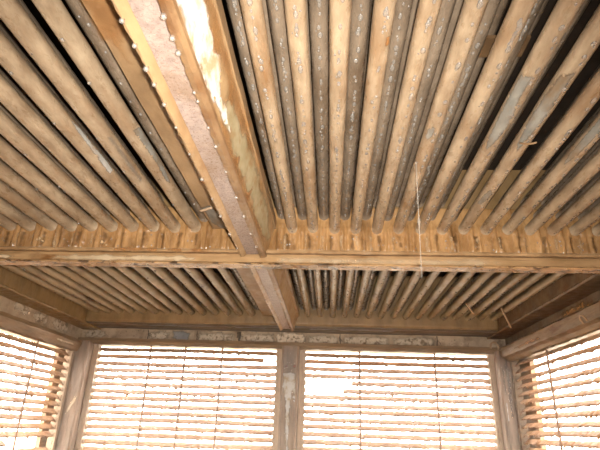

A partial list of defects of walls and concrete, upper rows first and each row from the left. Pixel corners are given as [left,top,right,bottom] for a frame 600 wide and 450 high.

peeling [72,121,113,173]
peeling [487,74,532,149]
peeling [517,73,574,149]
peeling [565,119,600,164]
peeling [283,373,295,450]